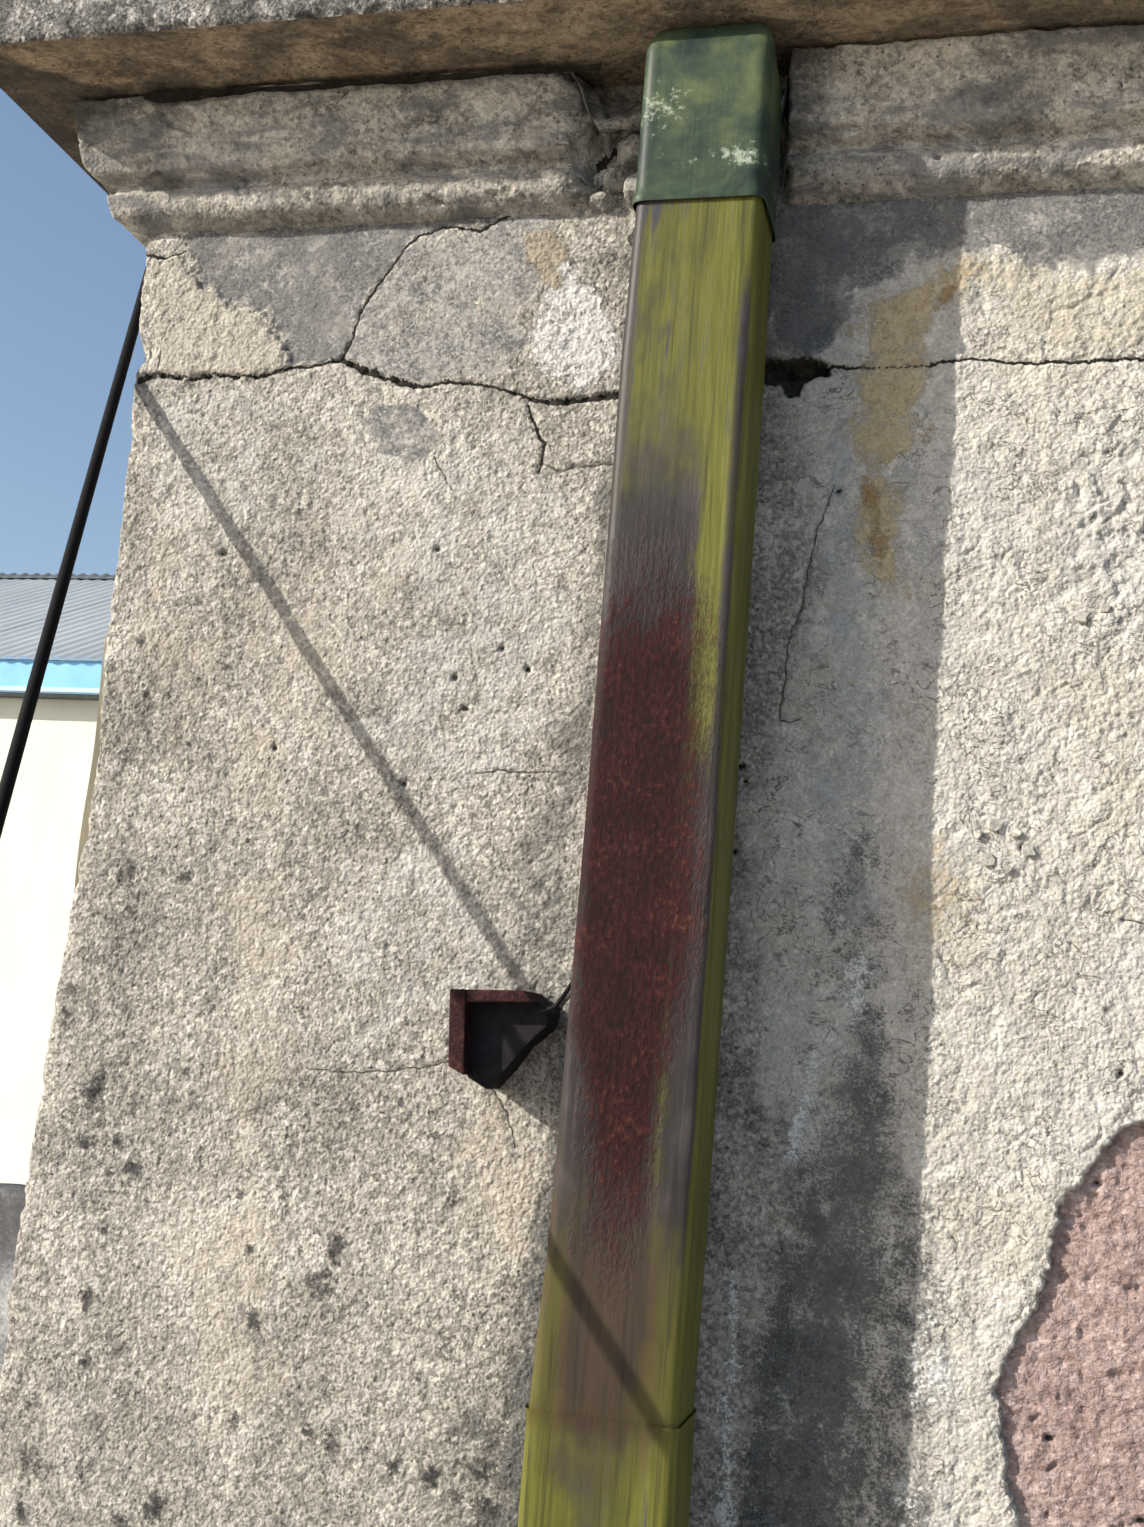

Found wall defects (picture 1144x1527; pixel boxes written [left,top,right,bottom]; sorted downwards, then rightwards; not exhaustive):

crack [596,147,618,174]
crack [137,216,619,473]
rust [839,258,984,598]
crack [773,357,1144,384]
crack [779,484,836,723]
crack [308,1060,448,1073]
crack [490,1089,515,1148]
crack [557,994,570,1011]
water stain [714,420,970,1527]
flaking render [995,1122,1144,1527]